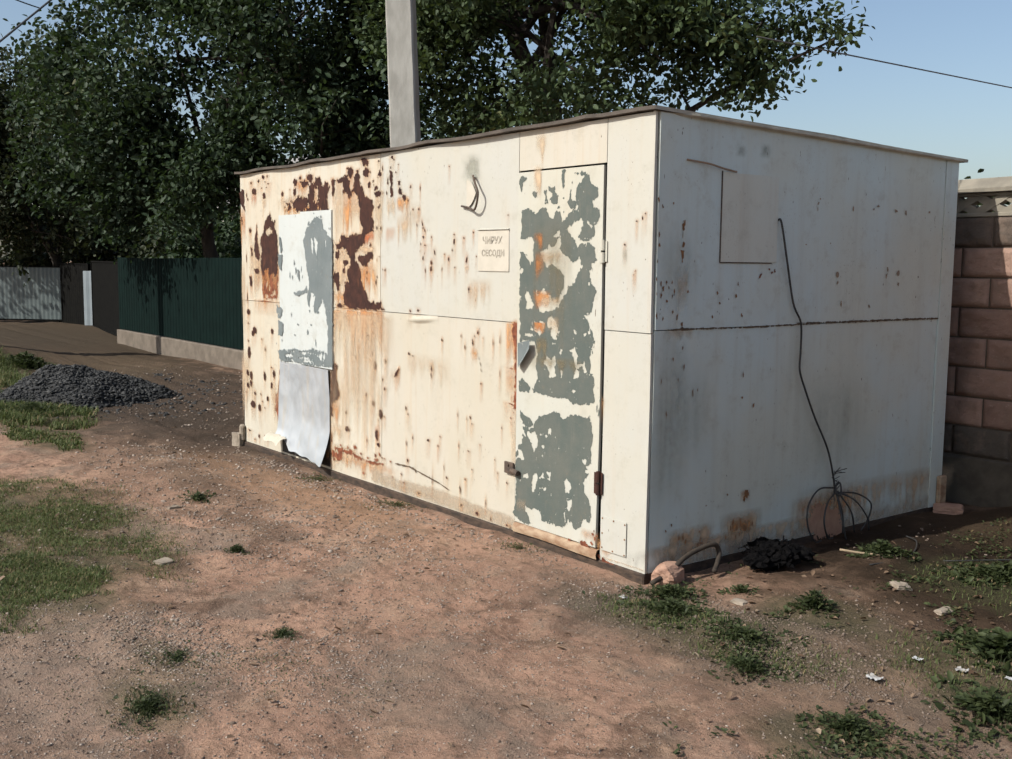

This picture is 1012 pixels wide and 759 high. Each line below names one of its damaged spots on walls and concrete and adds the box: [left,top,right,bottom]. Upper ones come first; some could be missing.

rust [239,175,280,415]
peeling [276,213,333,368]
rust [330,363,349,455]
rust [281,156,419,390]
rust [499,322,517,429]
peeling [513,169,601,530]
rust [665,476,924,557]